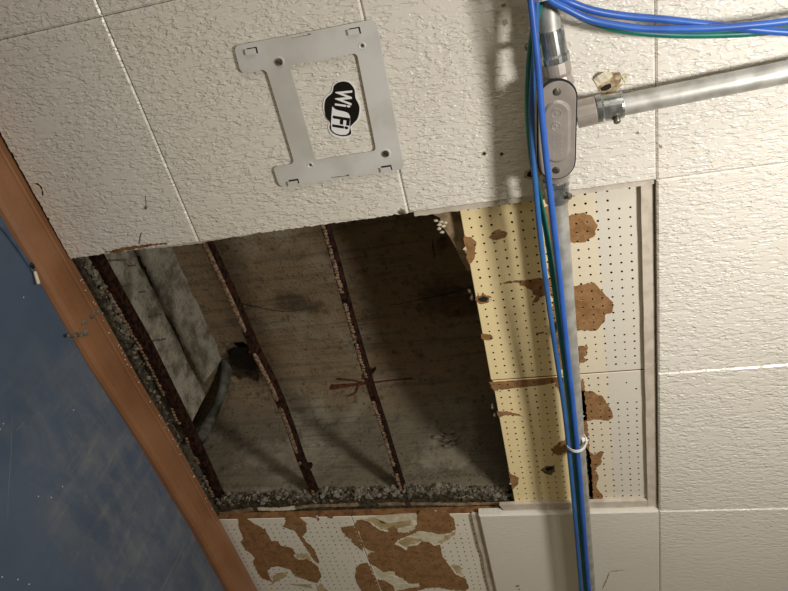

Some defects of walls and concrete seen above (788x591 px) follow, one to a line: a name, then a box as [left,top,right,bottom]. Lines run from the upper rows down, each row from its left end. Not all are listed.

spalling [105,232,167,253]
damp [224,347,260,381]